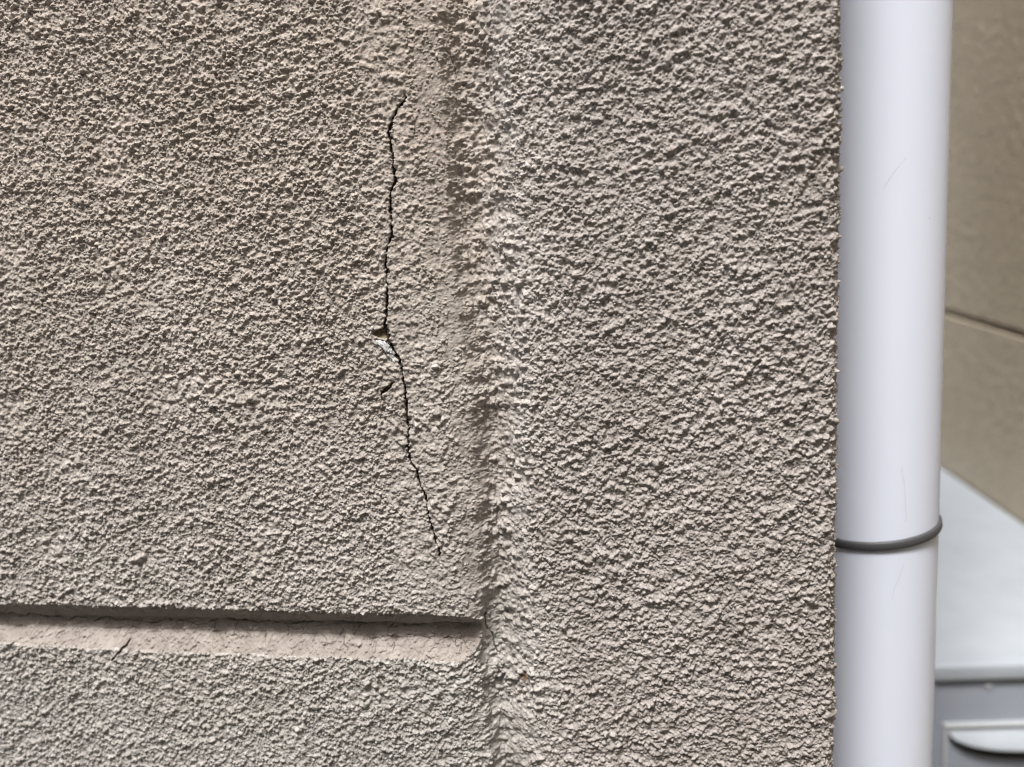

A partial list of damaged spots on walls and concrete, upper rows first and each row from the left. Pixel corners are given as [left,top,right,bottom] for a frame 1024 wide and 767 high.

crack [383,97,441,556]